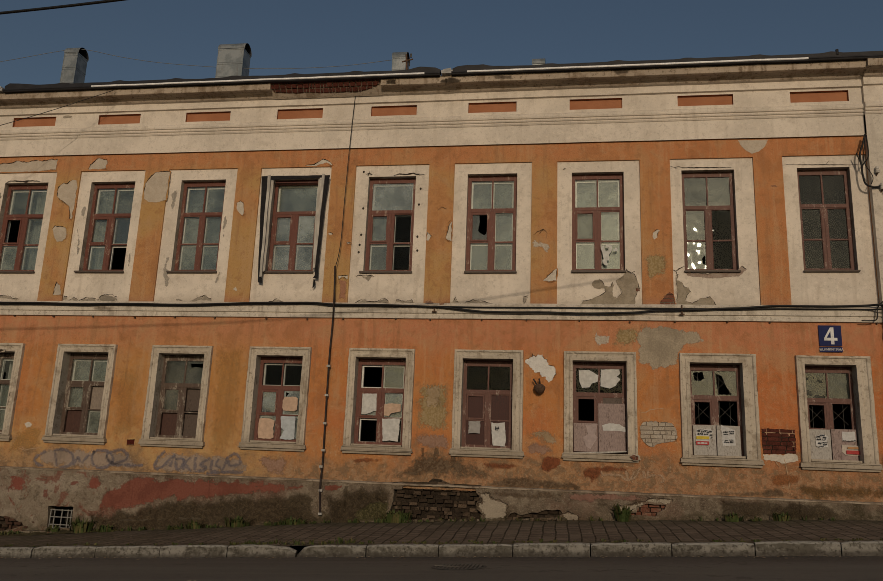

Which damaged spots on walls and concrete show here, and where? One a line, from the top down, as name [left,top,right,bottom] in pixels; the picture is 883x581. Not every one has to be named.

flaking render [271,79,380,94]
peeling [143,170,177,208]
peeling [52,179,86,254]
peeling [581,255,666,304]
peeling [659,265,747,305]
peeling [595,326,704,370]
flaking render [639,420,678,447]
flaking render [760,427,798,464]
spalling [0,516,34,531]
leakage [91,493,314,530]
spalling [391,479,581,521]